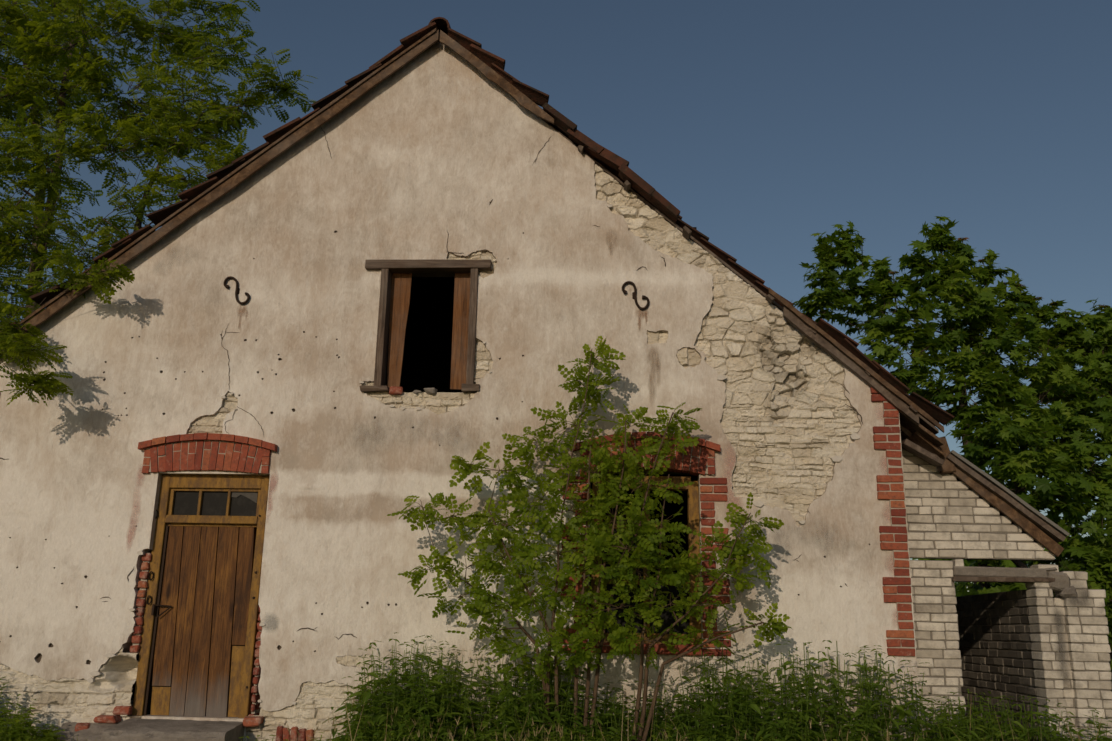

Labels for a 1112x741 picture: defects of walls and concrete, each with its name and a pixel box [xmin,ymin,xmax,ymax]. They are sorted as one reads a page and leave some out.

flaking render [447,251,509,278]
flaking render [188,392,241,434]
crack [221,326,264,435]
flaking render [359,339,501,415]
flaking render [594,164,861,527]
flaking render [0,643,141,740]
flaking render [246,655,400,741]